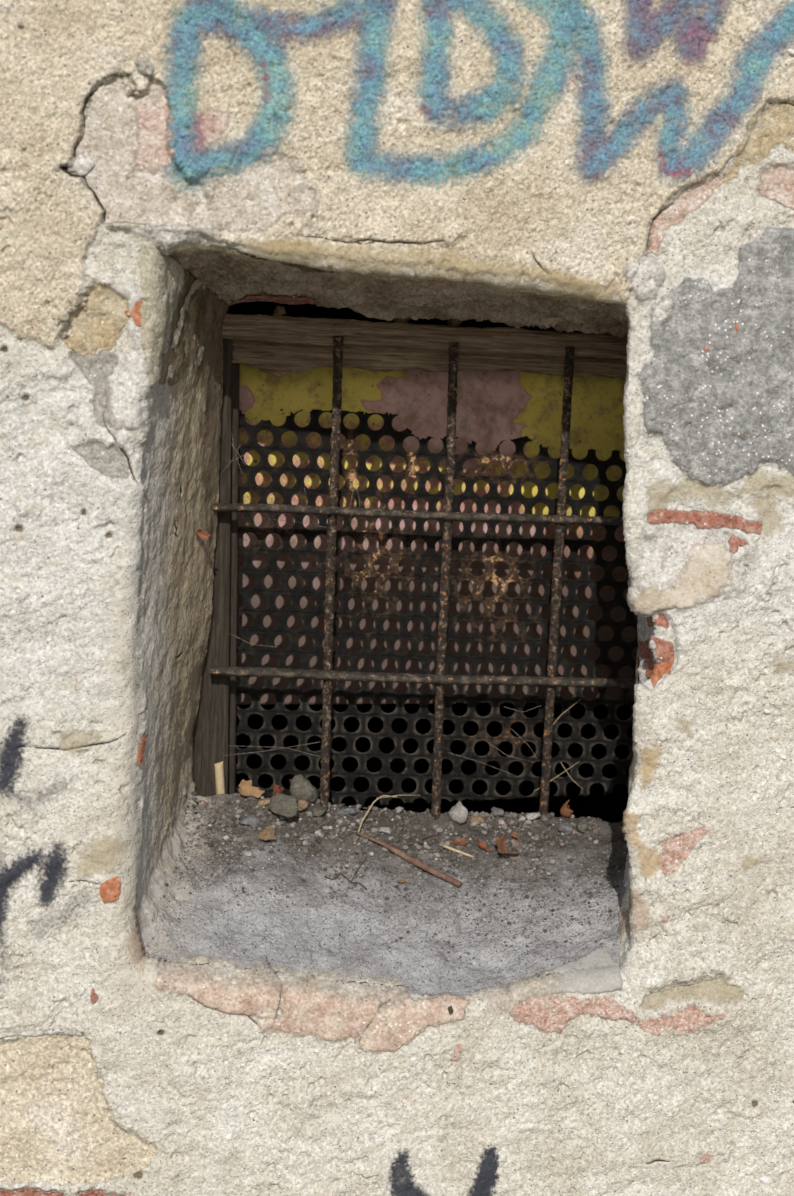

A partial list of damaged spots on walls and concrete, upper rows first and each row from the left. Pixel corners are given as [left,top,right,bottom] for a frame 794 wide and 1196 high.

crack [59,74,136,222]
flaking render [62,58,319,236]
flaking render [647,99,794,255]
crack [229,236,444,275]
flaking render [626,509,762,690]
flaking render [154,955,469,1052]
flaking render [490,972,724,1036]
flaking render [0,1028,158,1196]